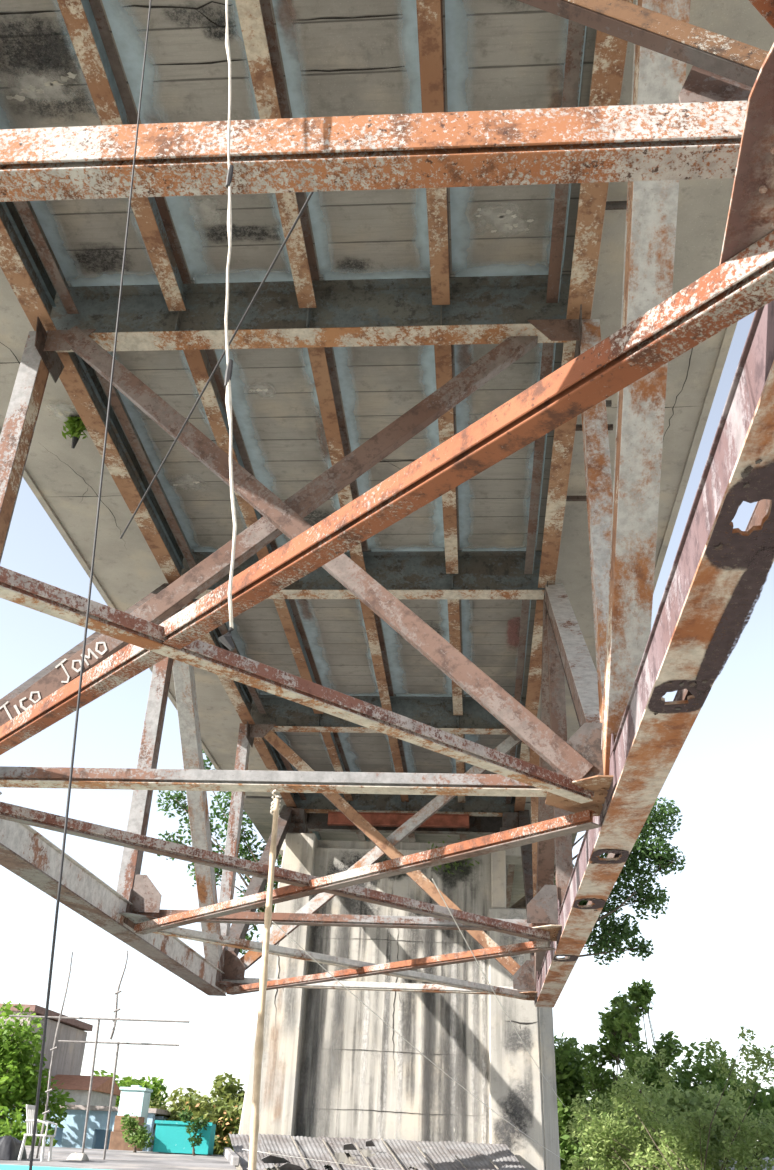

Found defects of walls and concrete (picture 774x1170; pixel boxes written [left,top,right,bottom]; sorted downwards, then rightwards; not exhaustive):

leakage [0,17,76,80]
crack [117,1,235,27]
leakage [166,7,235,40]
leakage [22,87,96,117]
leakage [73,246,128,273]
leakage [309,901,366,975]
leakage [353,897,532,1147]
leakage [286,988,343,1137]